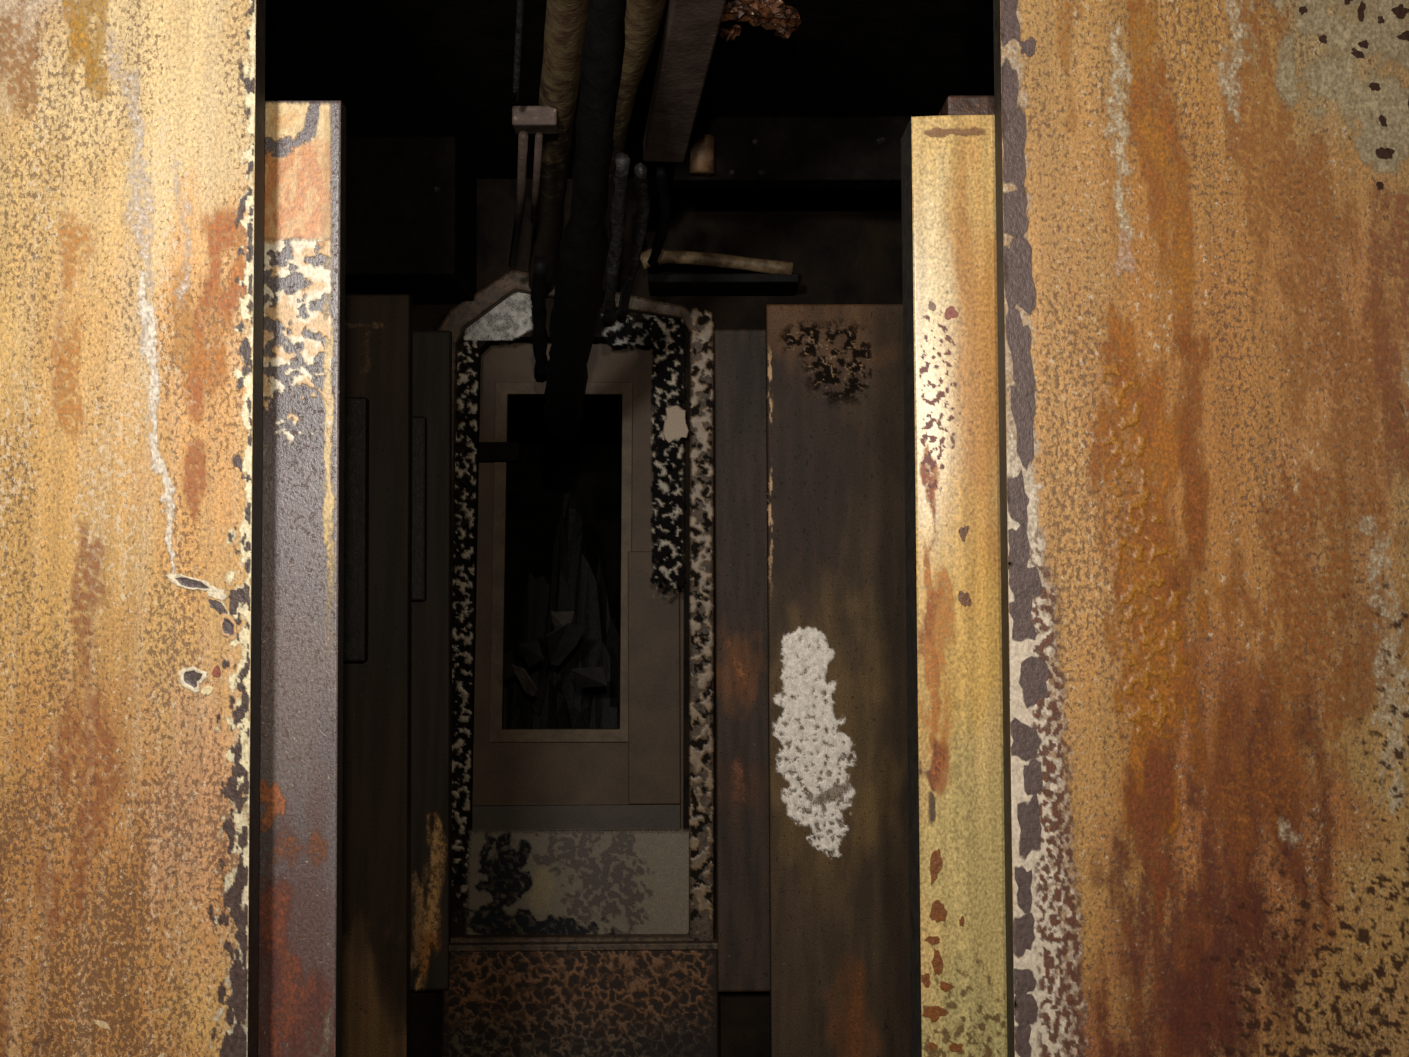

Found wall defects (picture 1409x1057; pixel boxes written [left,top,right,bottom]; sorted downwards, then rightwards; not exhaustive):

rust [0,0,43,118]
rust [924,127,984,137]
peeling [1219,0,1250,122]
peeling [1275,0,1409,190]
rust [173,211,247,423]
rust [919,300,961,518]
peeling [166,0,384,1057]
peeling [1000,0,1071,1057]
rust [919,547,953,822]
peeling [1360,516,1409,813]
rust [259,779,333,1057]
rust [923,973,1005,1057]